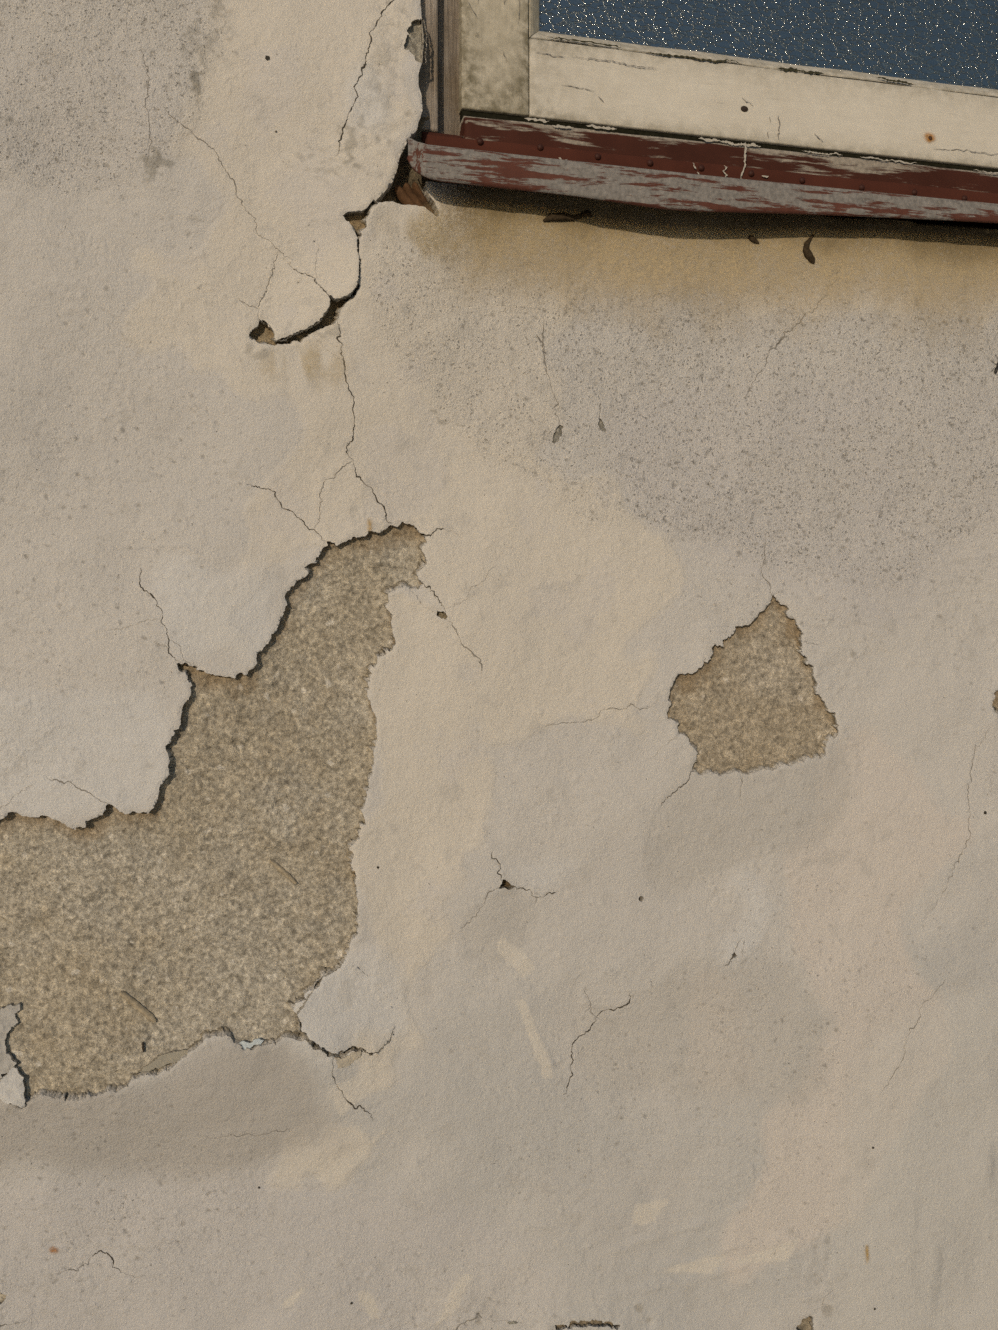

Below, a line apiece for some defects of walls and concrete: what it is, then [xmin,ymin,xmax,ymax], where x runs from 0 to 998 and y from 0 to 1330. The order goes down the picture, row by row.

crack [125,0,394,538]
crack [115,568,191,665]
crack [422,567,494,677]
flaking render [667,594,839,776]
flaking render [0,522,448,1109]
crack [461,854,557,929]